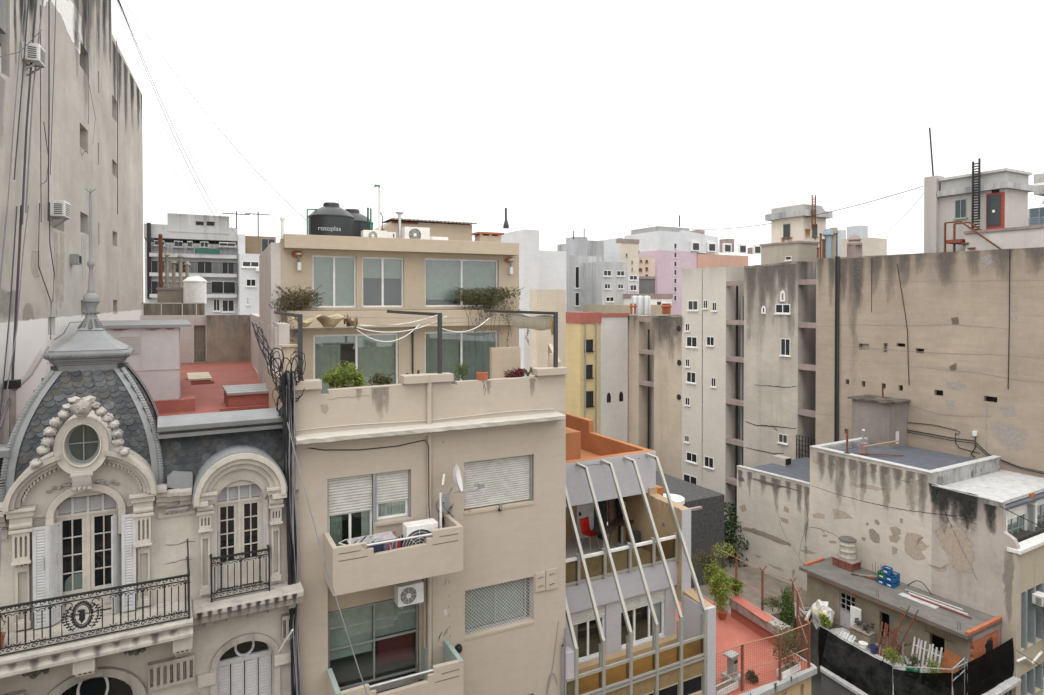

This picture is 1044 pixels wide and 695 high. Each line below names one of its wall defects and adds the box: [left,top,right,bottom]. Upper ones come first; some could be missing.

water stain [14,0,35,37]
water stain [75,0,142,119]
water stain [970,249,1009,265]
water stain [1027,247,1043,261]
water stain [818,253,922,300]
water stain [738,470,809,508]
water stain [819,452,997,531]